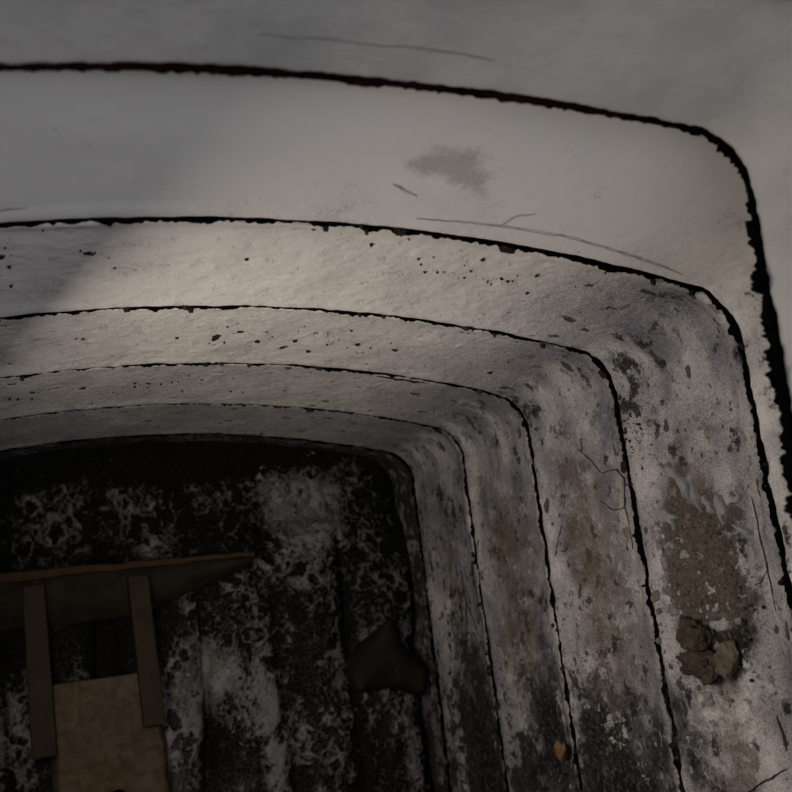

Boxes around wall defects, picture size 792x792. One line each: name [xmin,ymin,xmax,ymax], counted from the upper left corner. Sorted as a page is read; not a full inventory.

crack [0,62,792,612]
efflorescence [244,451,348,568]
crack [0,305,686,792]
spalling [655,462,766,650]
efflorescence [167,631,256,726]
crack [748,716,788,792]